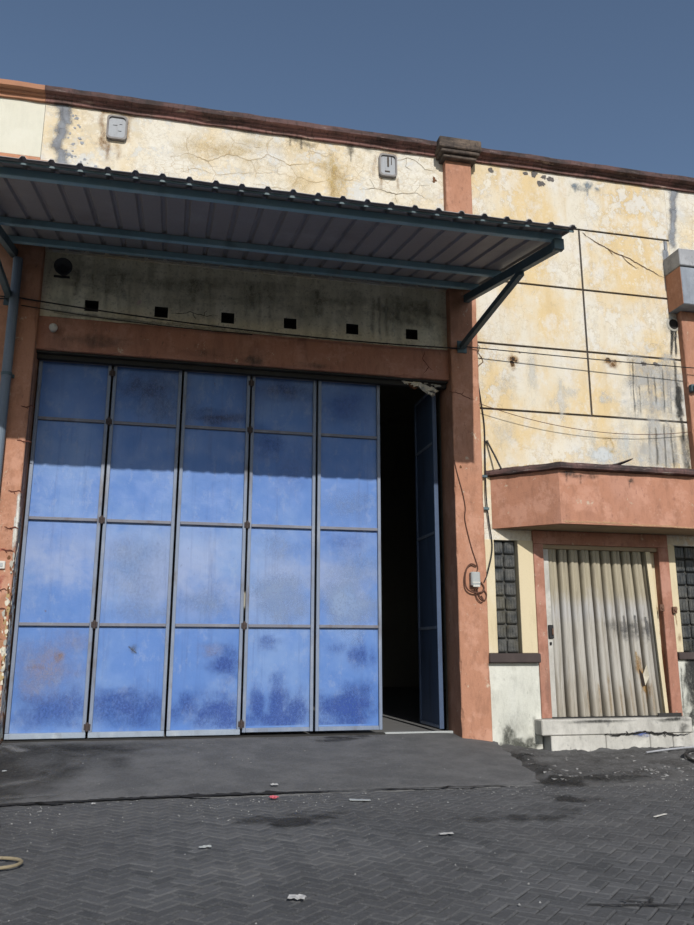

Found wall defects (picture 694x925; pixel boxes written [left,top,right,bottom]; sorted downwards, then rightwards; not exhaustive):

leakage [51,104,72,164]
crack [170,131,433,204]
spalling [523,171,554,187]
crack [582,232,662,277]
leakage [663,190,678,265]
spalling [403,381,441,397]
leakage [629,330,690,469]
peeling [0,495,21,742]
leakage [665,644,694,731]